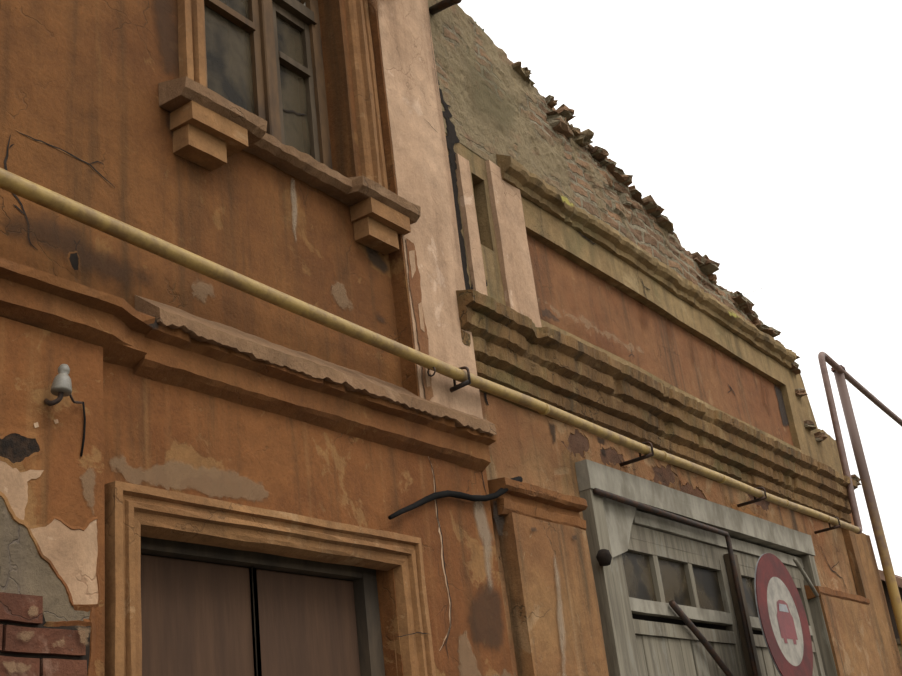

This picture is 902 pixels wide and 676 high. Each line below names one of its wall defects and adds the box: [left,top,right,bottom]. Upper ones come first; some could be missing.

crack [4,129,114,188]
crack [12,193,36,249]
flaking render [0,422,101,676]